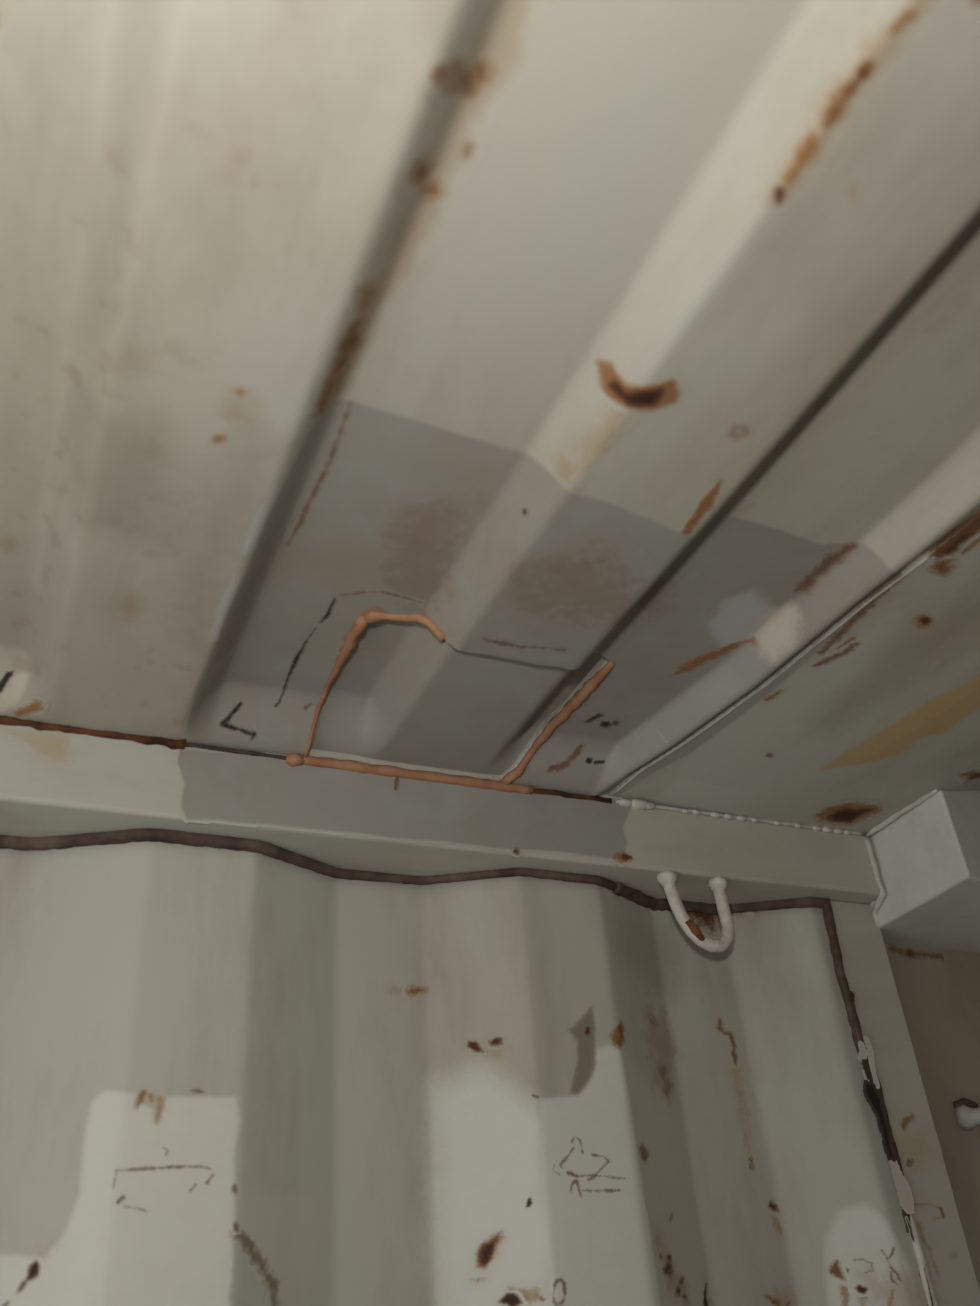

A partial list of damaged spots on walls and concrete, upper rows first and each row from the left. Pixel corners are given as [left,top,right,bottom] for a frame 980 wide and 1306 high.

corrosion [747,0,954,220]
corrosion [297,0,549,431]
corrosion [543,349,689,492]
corrosion [806,506,980,672]
corrosion [806,798,890,828]
corrosion [463,1226,548,1306]